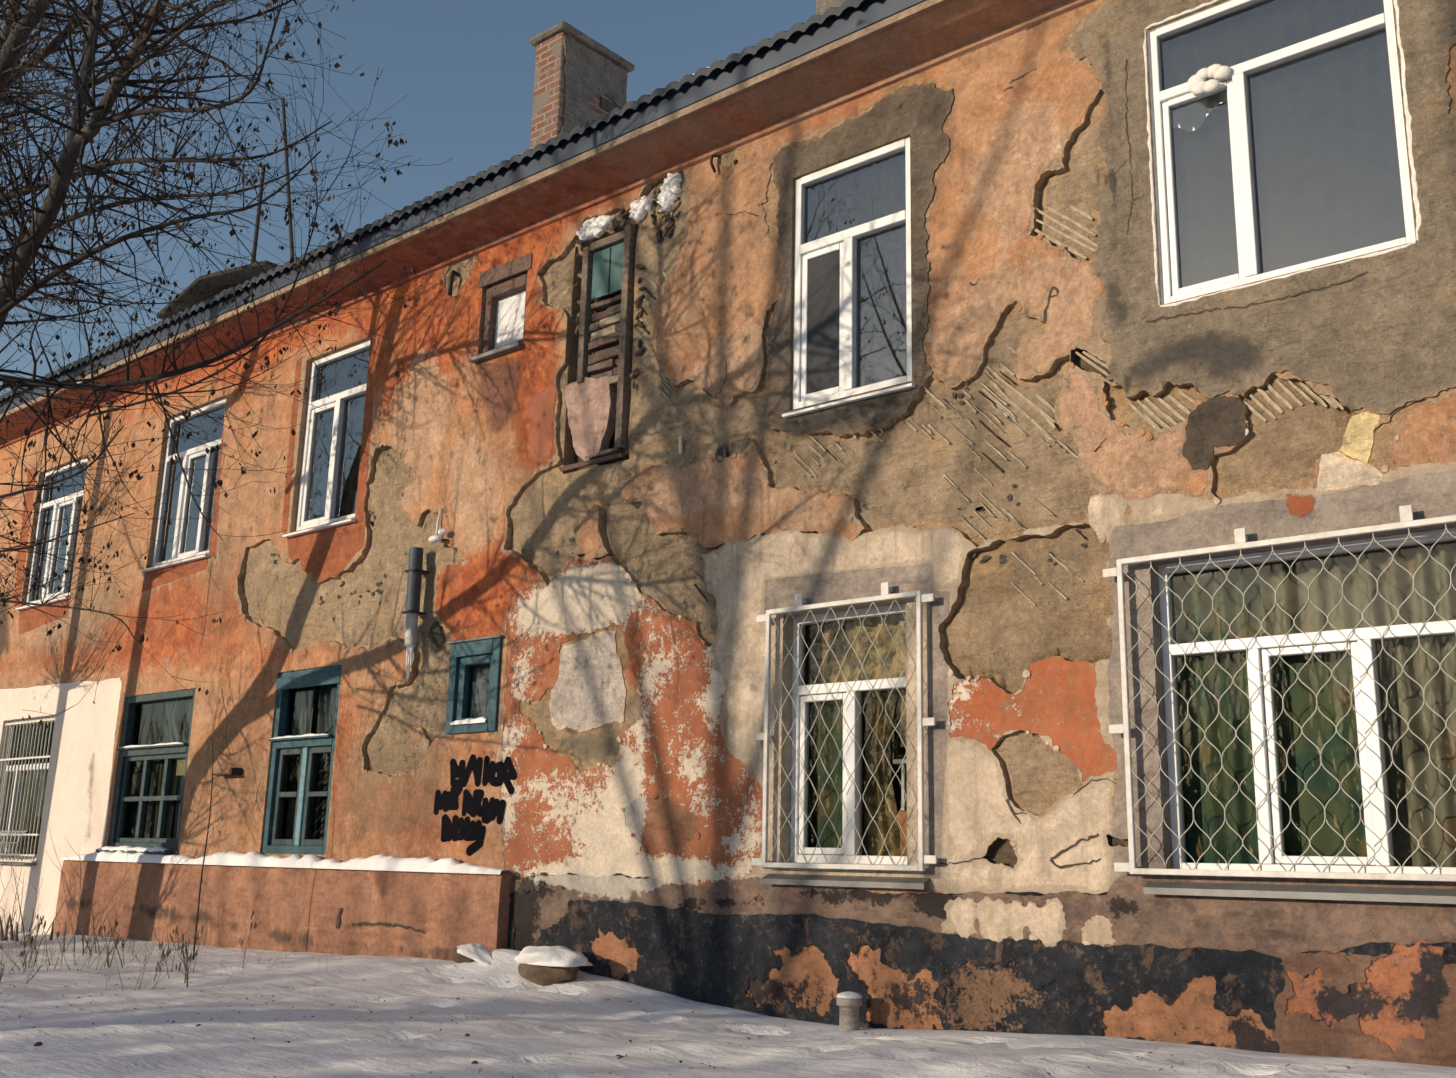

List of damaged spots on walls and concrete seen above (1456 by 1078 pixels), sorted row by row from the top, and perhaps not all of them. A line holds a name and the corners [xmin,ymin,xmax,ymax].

flaking render [1030,85,1109,264]
damp [1124,334,1256,391]
crack [1146,271,1368,323]
flaking render [237,445,464,777]
flaking render [500,163,1210,951]
crack [1050,834,1101,869]